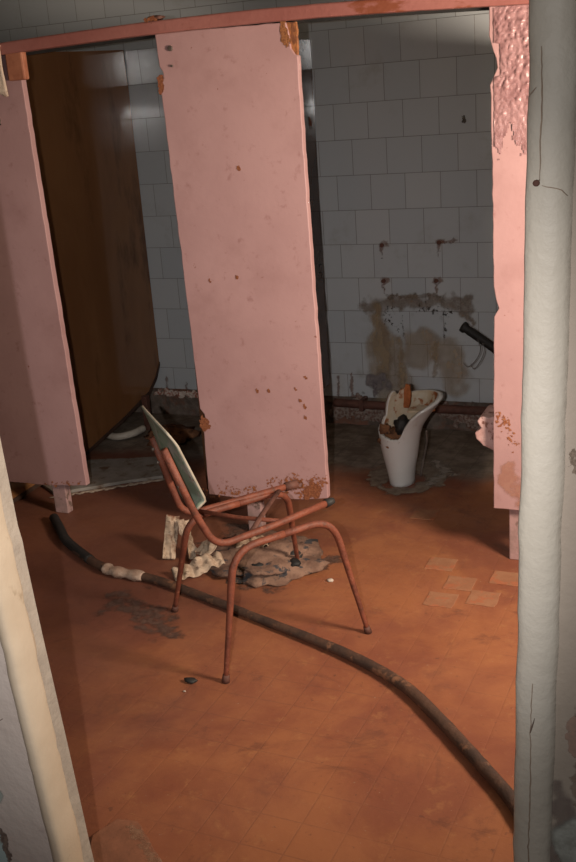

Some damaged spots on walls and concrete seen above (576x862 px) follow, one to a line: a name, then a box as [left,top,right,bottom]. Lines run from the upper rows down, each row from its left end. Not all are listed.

water stain [362,294,475,397]
corrosion [202,473,328,505]
spalling [0,828,12,862]